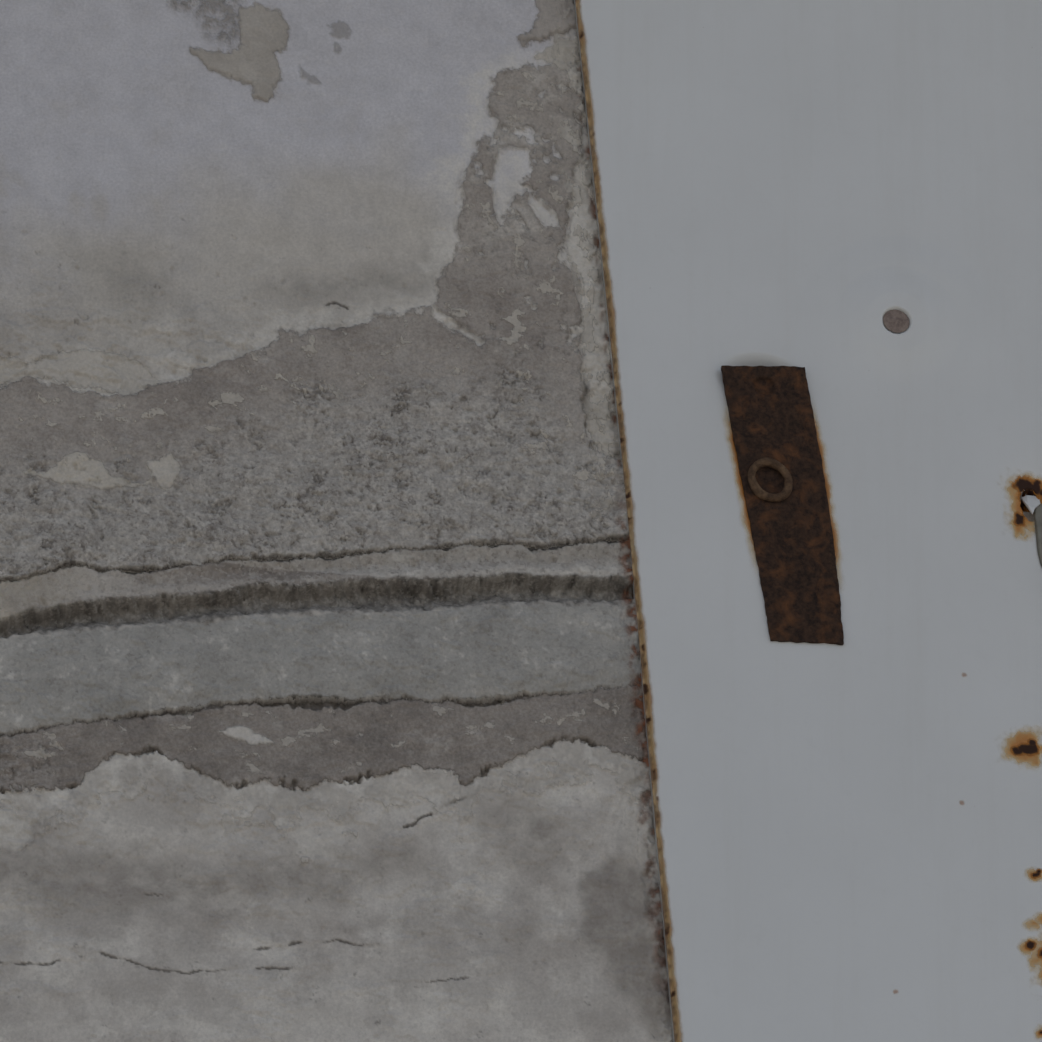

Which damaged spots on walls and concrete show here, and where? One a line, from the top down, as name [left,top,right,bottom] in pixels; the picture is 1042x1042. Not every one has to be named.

spalling [0,0,629,582]
rust [730,424,754,544]
rust [1008,476,1042,537]
crack [256,553,363,562]
crack [528,541,622,551]
spalling [0,685,651,854]
rust [1005,732,1042,766]
rust [1020,915,1042,979]